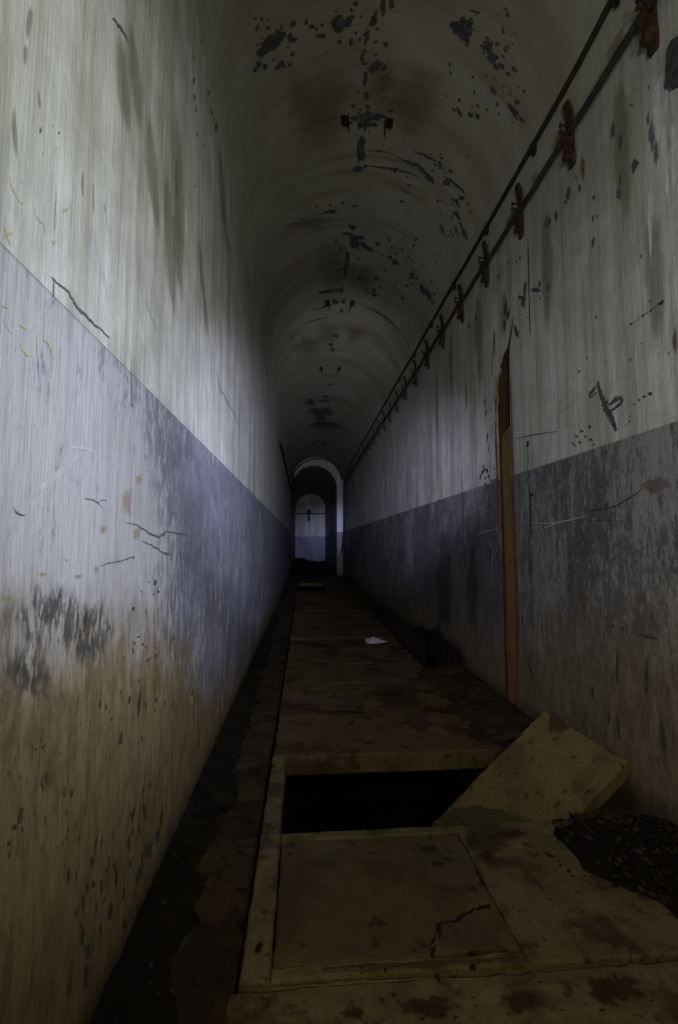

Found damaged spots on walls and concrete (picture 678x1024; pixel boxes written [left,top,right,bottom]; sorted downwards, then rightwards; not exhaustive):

peeling [253,0,471,240]
peeling [444,7,525,123]
crack [52,277,110,338]
peeling [291,224,437,350]
crack [102,522,189,566]
crack [431,905,490,984]